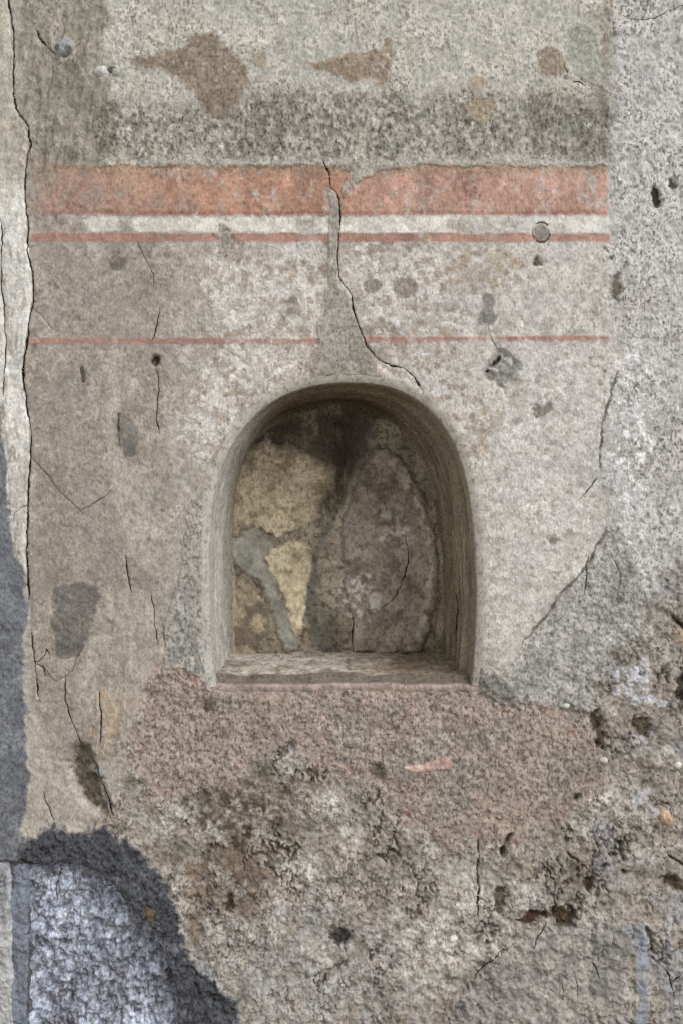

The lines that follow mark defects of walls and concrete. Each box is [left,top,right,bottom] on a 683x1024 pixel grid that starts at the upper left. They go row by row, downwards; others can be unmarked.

leakage [82,28,622,179]
crack [0,0,111,596]
leakage [94,335,170,569]
crack [322,159,422,389]
spalling [482,349,521,388]
crack [579,372,618,500]
leakage [63,582,165,750]
crack [522,527,621,644]